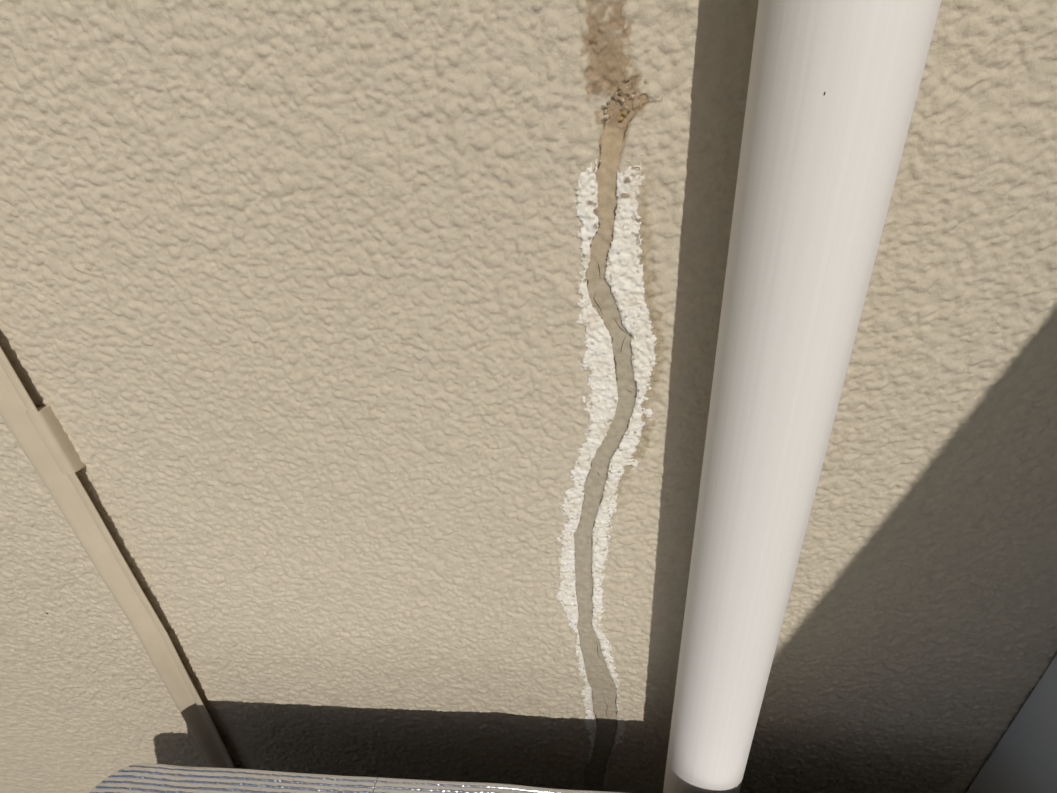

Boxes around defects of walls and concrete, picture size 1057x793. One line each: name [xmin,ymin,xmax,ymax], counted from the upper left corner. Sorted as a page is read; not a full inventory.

crack [556,82,657,791]